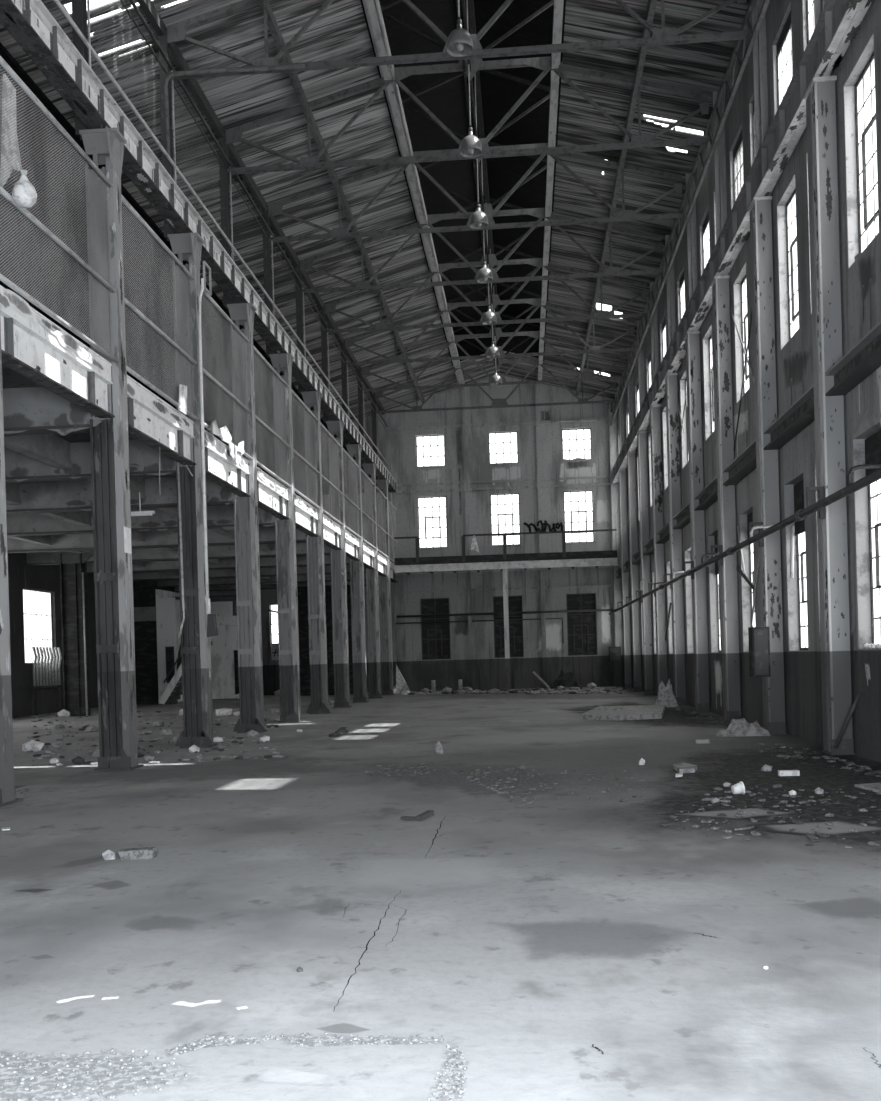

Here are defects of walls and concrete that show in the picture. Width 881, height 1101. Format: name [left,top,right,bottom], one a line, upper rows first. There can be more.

peeling [846,0,873,14]
peeling [789,25,860,151]
peeling [767,147,788,172]
peeling [0,288,108,373]
peeling [121,344,137,398]
peeling [126,398,373,571]
crack [334,891,407,1009]
water stain [459,912,740,969]